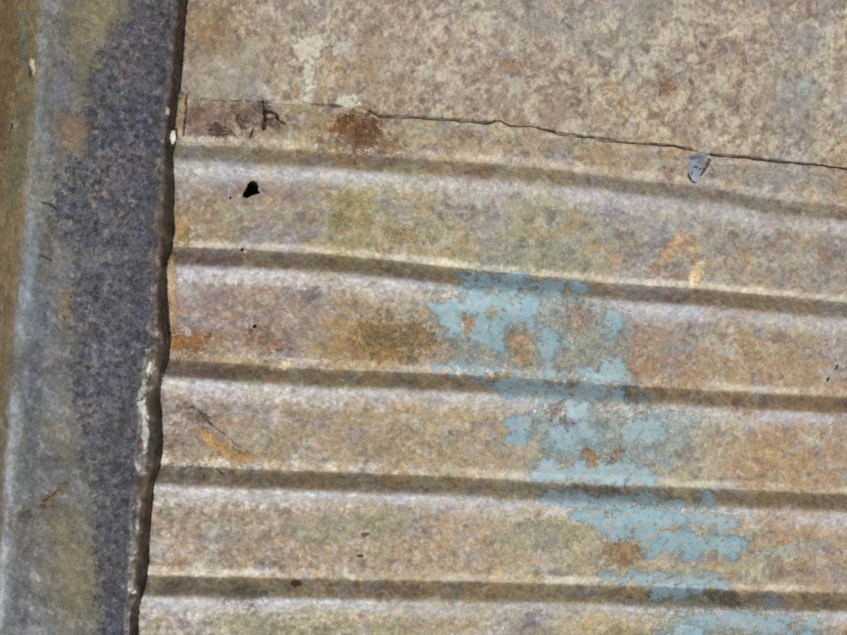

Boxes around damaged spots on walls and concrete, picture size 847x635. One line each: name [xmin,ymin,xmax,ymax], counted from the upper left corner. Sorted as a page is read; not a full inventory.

crack [180,95,188,136]
crack [206,100,286,138]
rust [317,110,401,154]
crack [368,110,495,124]
crack [537,127,616,141]
crack [650,143,791,163]
rust [359,316,436,365]
peeling [426,269,828,635]